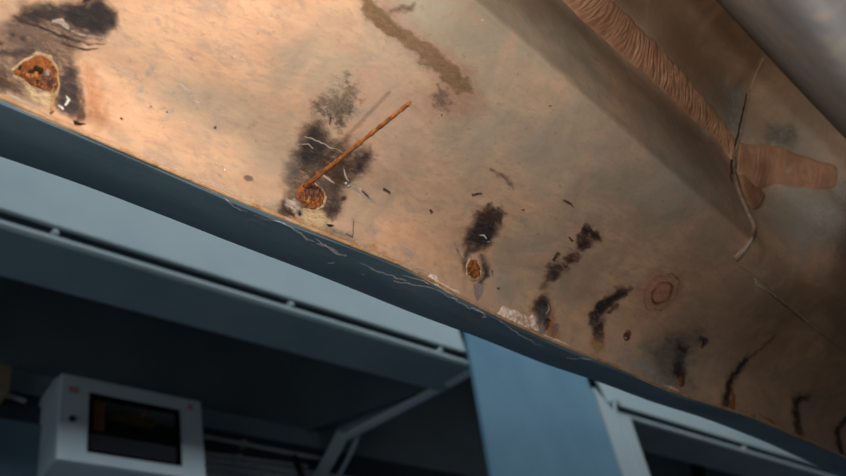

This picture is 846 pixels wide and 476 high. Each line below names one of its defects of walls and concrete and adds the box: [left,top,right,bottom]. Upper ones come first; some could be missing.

rust [10,51,60,96]
water stain [363,0,471,104]
crack [730,93,748,183]
rust [296,182,327,227]